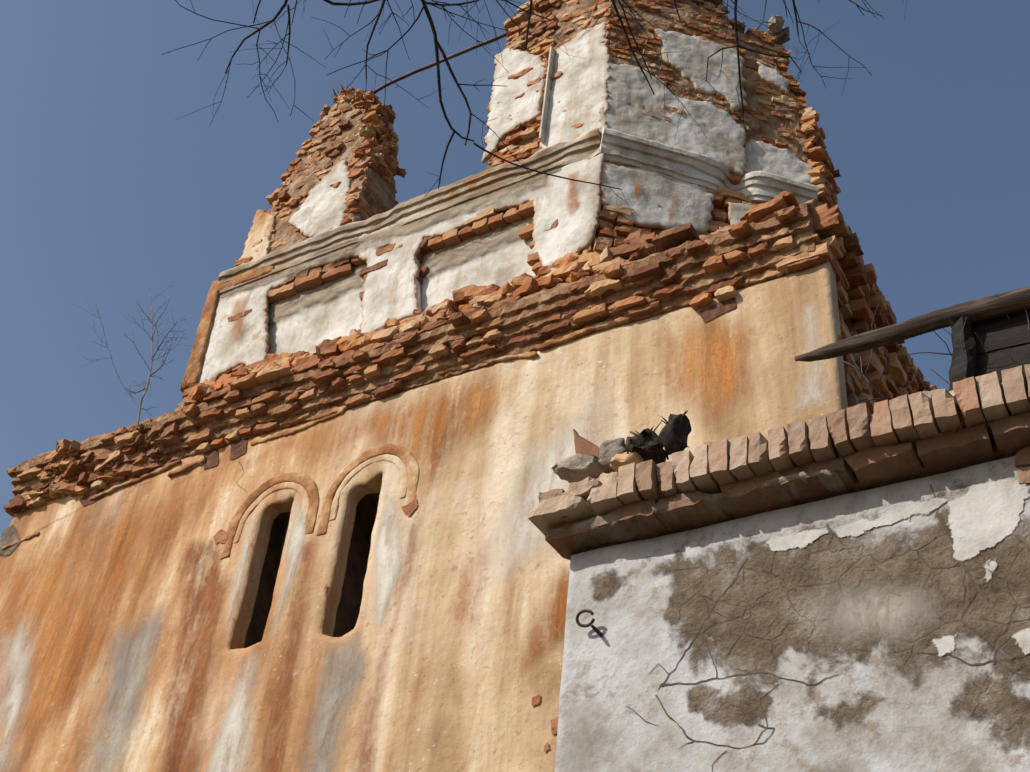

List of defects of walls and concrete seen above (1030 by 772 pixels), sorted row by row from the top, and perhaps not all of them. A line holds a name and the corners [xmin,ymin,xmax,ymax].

corrosion [676,327,744,407]
corrosion [2,505,175,730]
corrosion [165,544,222,772]
corrosion [263,621,299,772]
corrosion [532,577,569,656]
crack [627,558,839,772]
crack [826,524,844,547]
spalling [653,446,1030,752]
crack [916,484,1030,679]